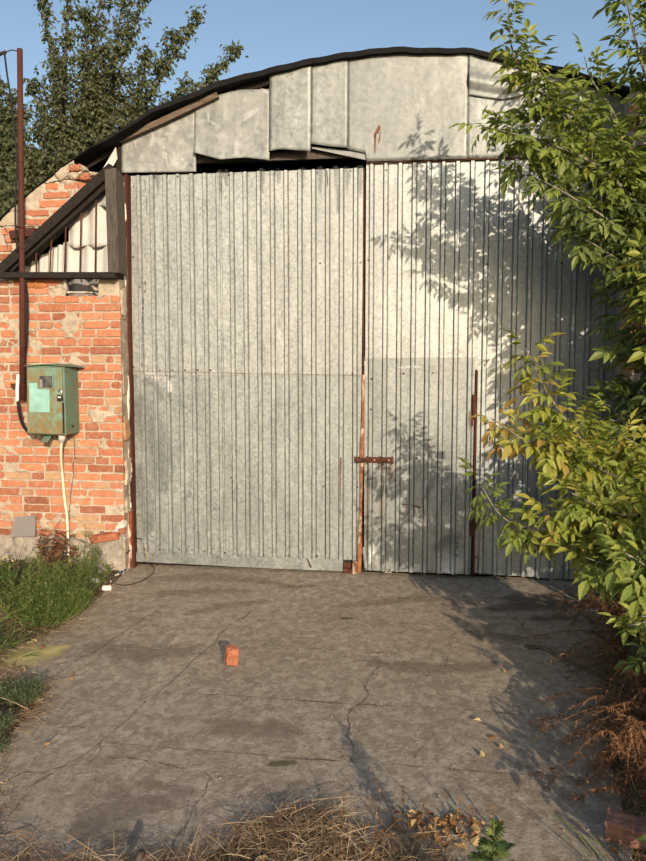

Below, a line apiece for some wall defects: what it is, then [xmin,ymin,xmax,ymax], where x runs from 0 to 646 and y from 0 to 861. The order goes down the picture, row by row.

spalling [26,279,49,288]
spalling [63,279,100,294]
spalling [112,359,132,542]
crack [0,607,579,861]